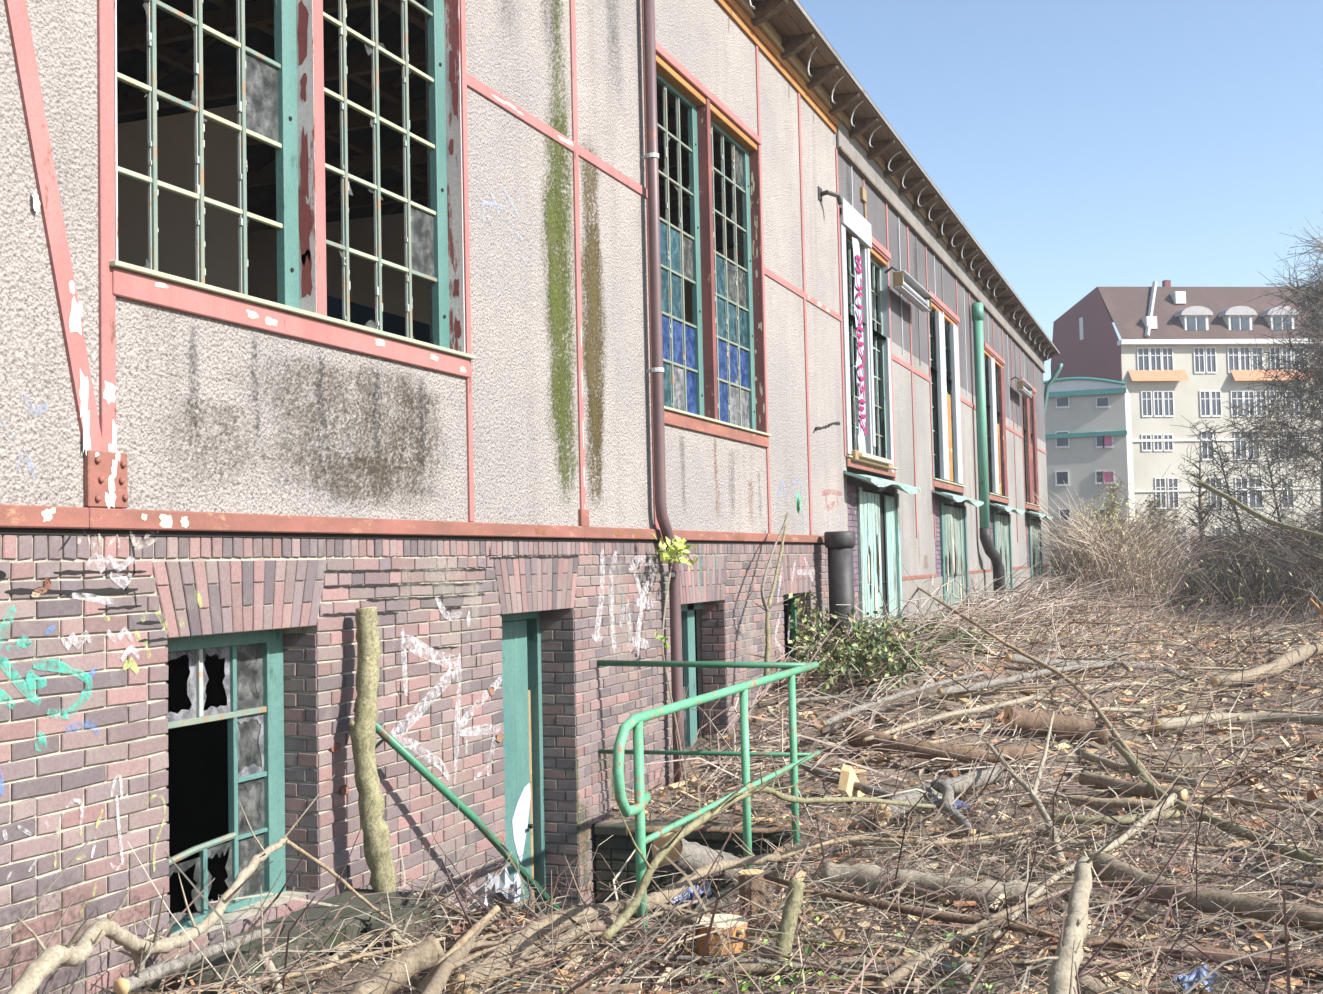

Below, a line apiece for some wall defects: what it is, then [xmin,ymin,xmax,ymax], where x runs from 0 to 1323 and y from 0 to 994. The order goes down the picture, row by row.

peeling [297,0,309,102]
peeling [449,50,458,119]
peeling [299,128,313,297]
leakage [543,0,606,498]
peeling [69,280,83,335]
peeling [246,309,277,326]
peeling [79,369,120,508]
peeling [42,507,56,522]
peeling [141,513,189,528]